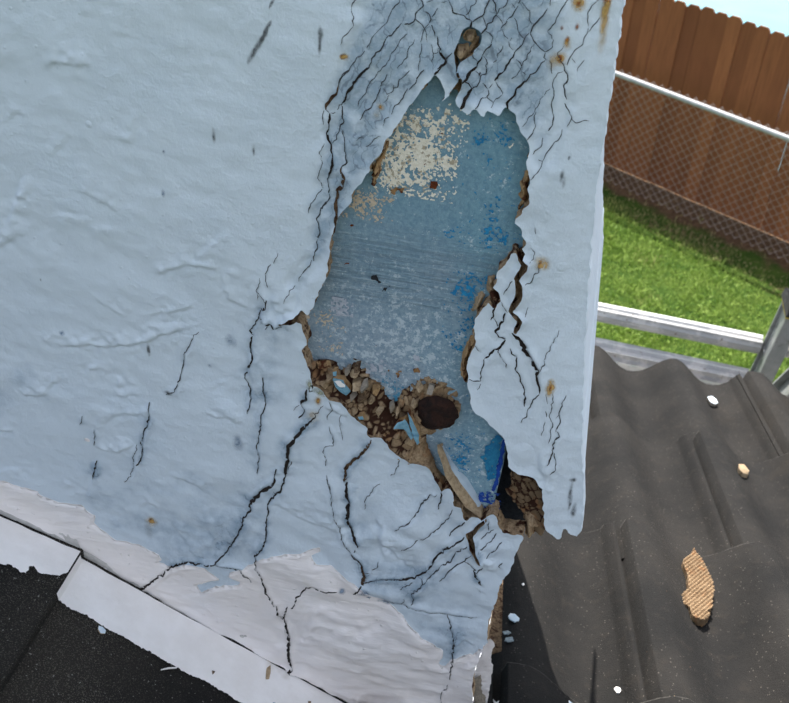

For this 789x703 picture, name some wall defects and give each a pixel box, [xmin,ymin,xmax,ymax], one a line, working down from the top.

rust [601,0,611,30]
peeling [342,103,515,223]
peeling [479,196,521,253]
spalling [518,170,530,210]
crack [125,332,199,482]
crack [140,0,600,703]
spalling [306,297,506,518]
spalling [441,271,500,382]
spalling [525,511,538,538]